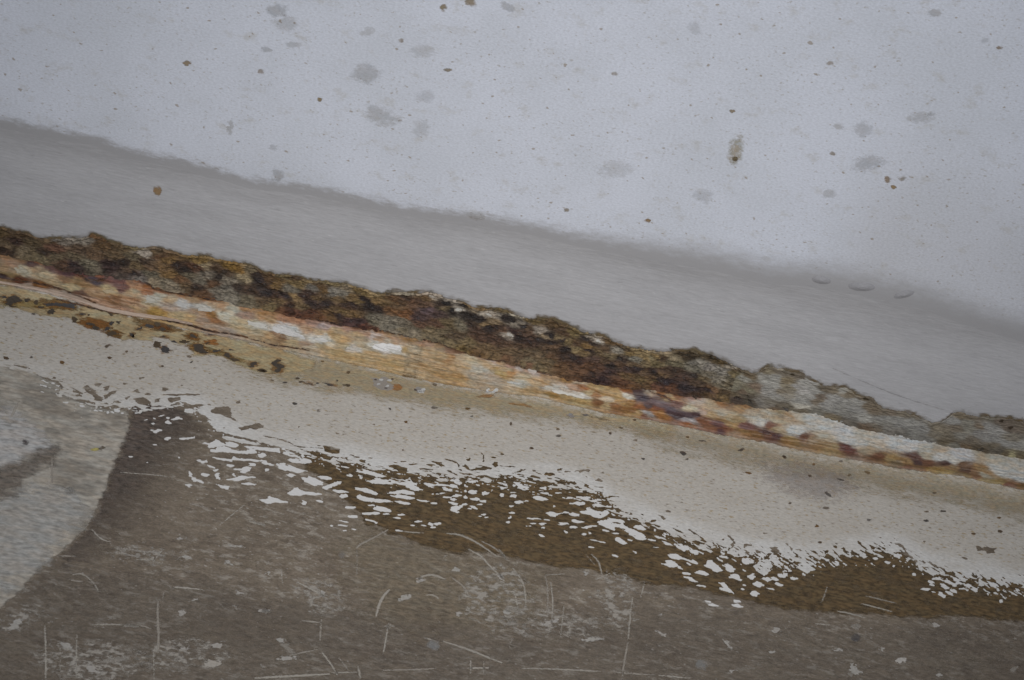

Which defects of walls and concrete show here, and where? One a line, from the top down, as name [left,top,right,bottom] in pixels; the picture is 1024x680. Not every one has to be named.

spalling [0,226,1024,459]
rust [0,255,1024,532]
water stain [294,439,1024,621]